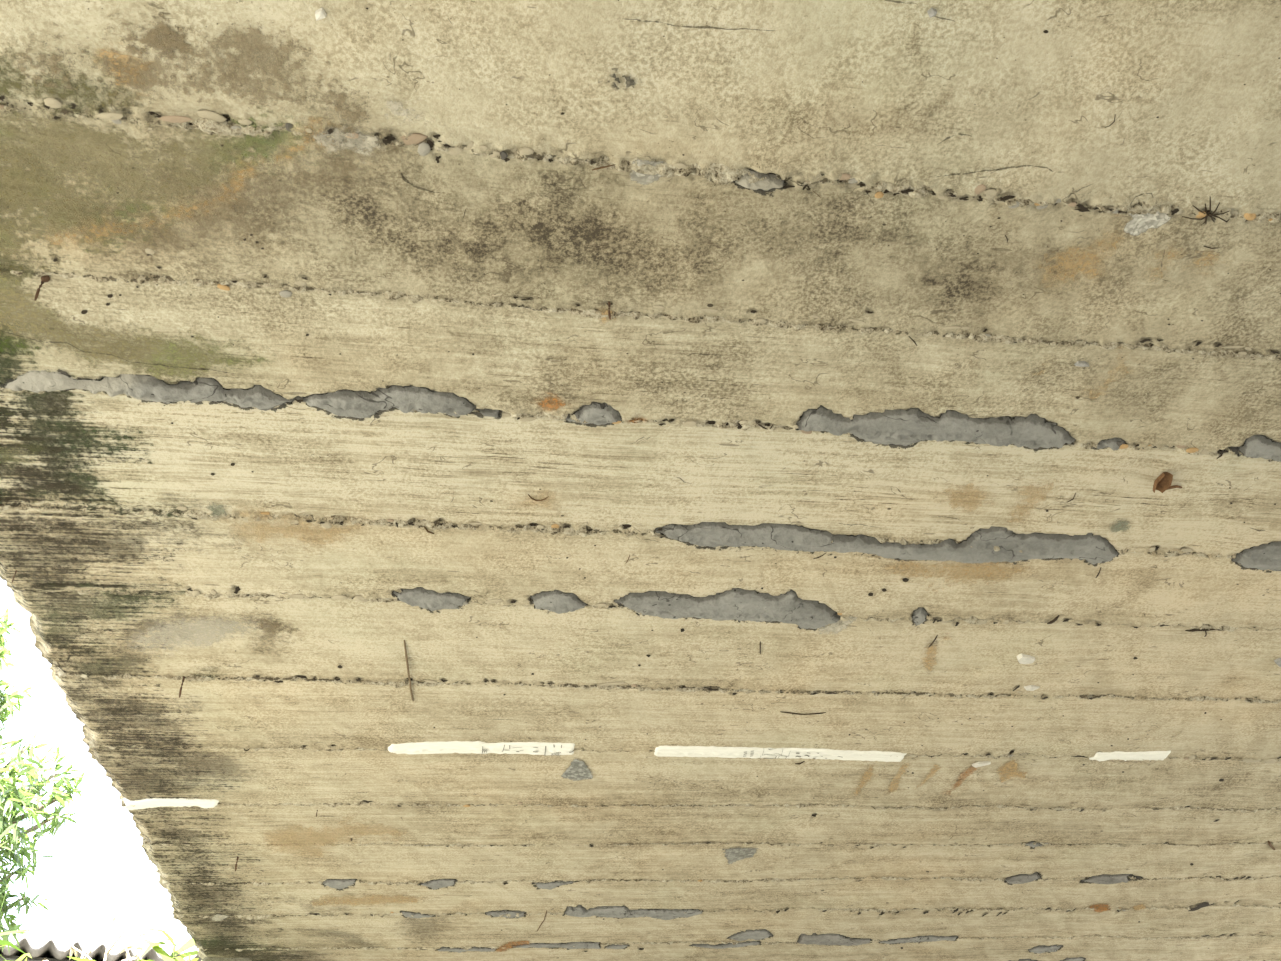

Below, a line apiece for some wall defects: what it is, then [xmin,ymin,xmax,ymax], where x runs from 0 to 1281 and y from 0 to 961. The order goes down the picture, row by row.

damp [0,14,369,272]
damp [0,275,308,961]